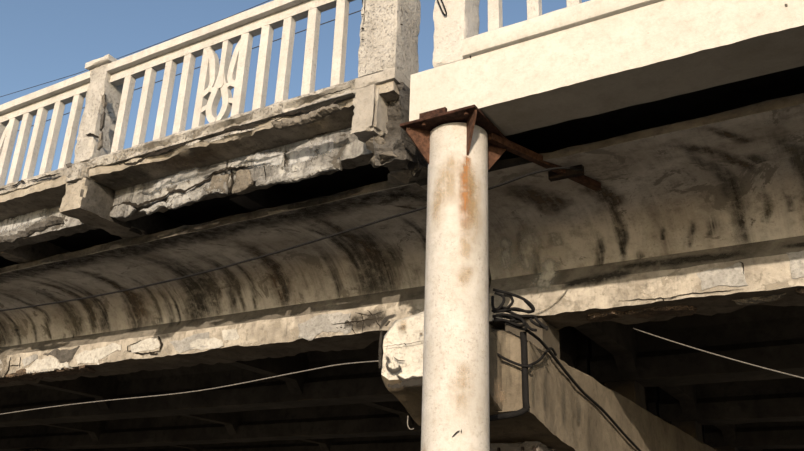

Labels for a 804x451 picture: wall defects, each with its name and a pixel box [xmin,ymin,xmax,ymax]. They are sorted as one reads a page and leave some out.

spalling [366,82,428,184]
crack [110,166,266,209]
rust [447,156,477,213]
leakage [0,185,427,341]
leakage [566,225,739,286]
peeling [131,329,240,353]
peeling [298,312,352,341]
crack [333,310,383,333]
leakage [345,311,385,368]
peeling [0,343,121,385]
spalling [386,356,422,381]
leakage [387,377,423,389]